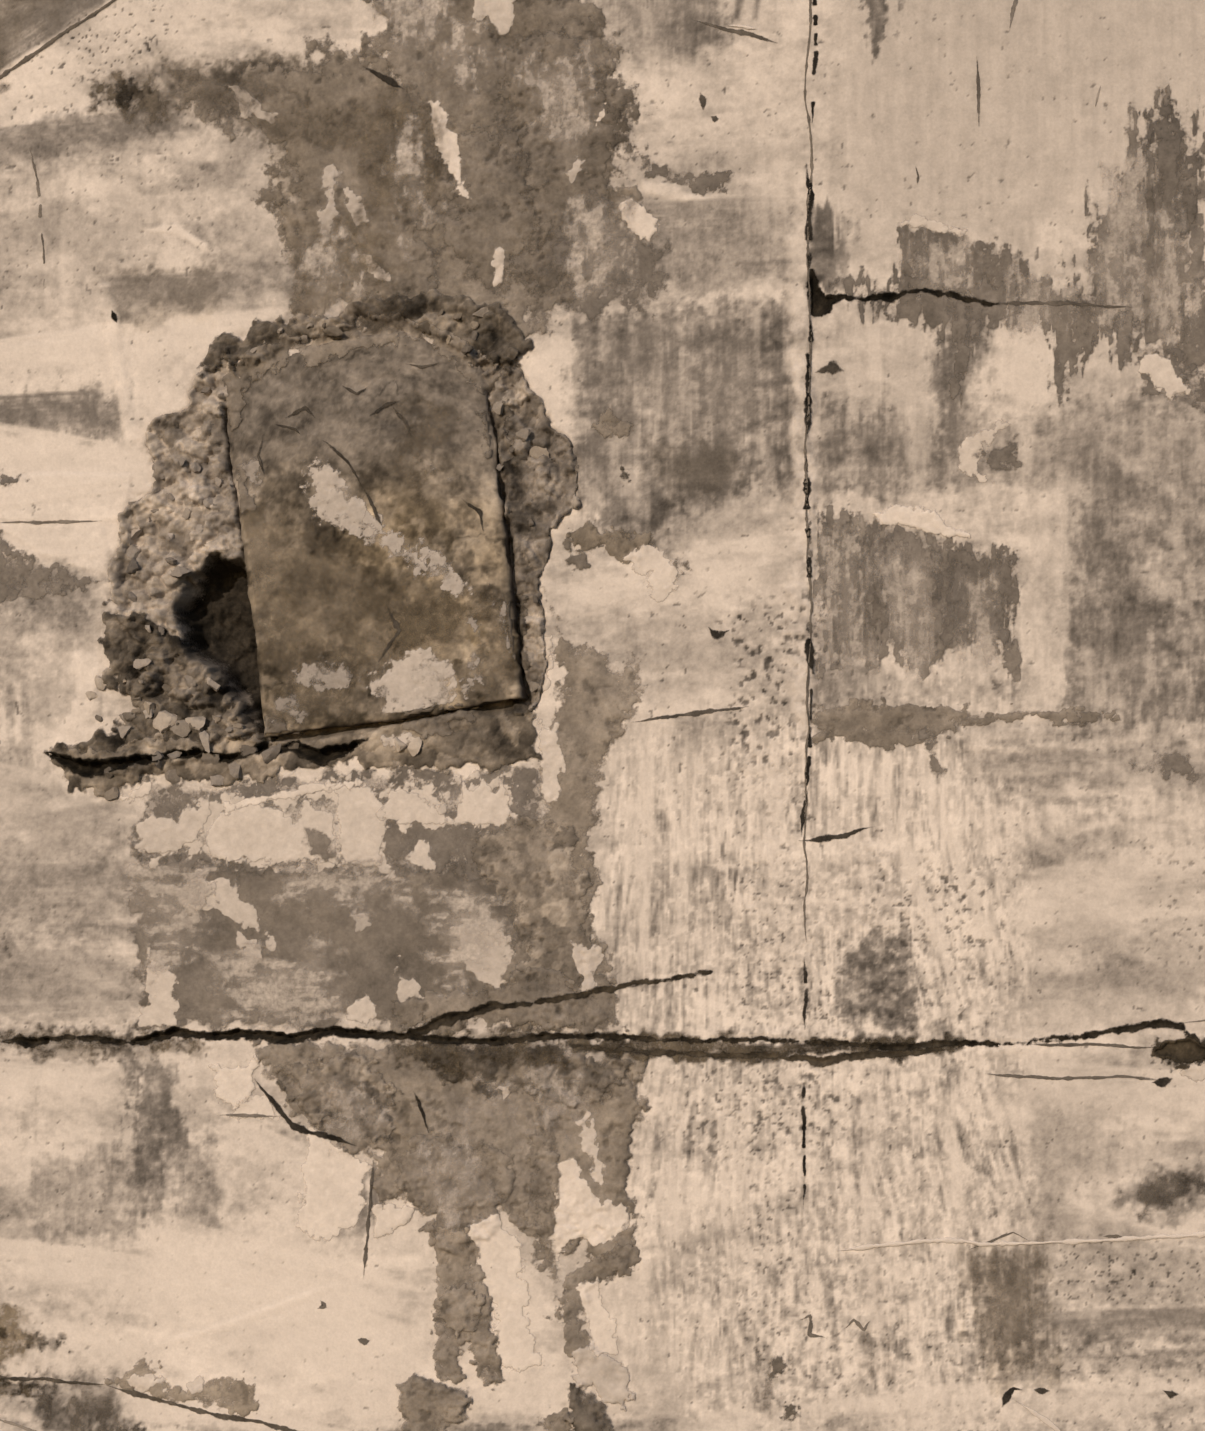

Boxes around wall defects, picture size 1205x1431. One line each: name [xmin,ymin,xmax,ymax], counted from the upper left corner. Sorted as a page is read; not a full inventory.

crack [0,0,115,79]
crack [697,21,773,42]
crack [800,0,1127,936]
crack [2,518,95,526]
peeling [0,0,732,1031]
rust [250,513,513,724]
crack [709,628,729,639]
crack [638,706,746,722]
crack [0,962,1205,1199]
crack [226,1082,374,1268]
crack [0,1376,297,1431]
spalling [105,1358,259,1418]